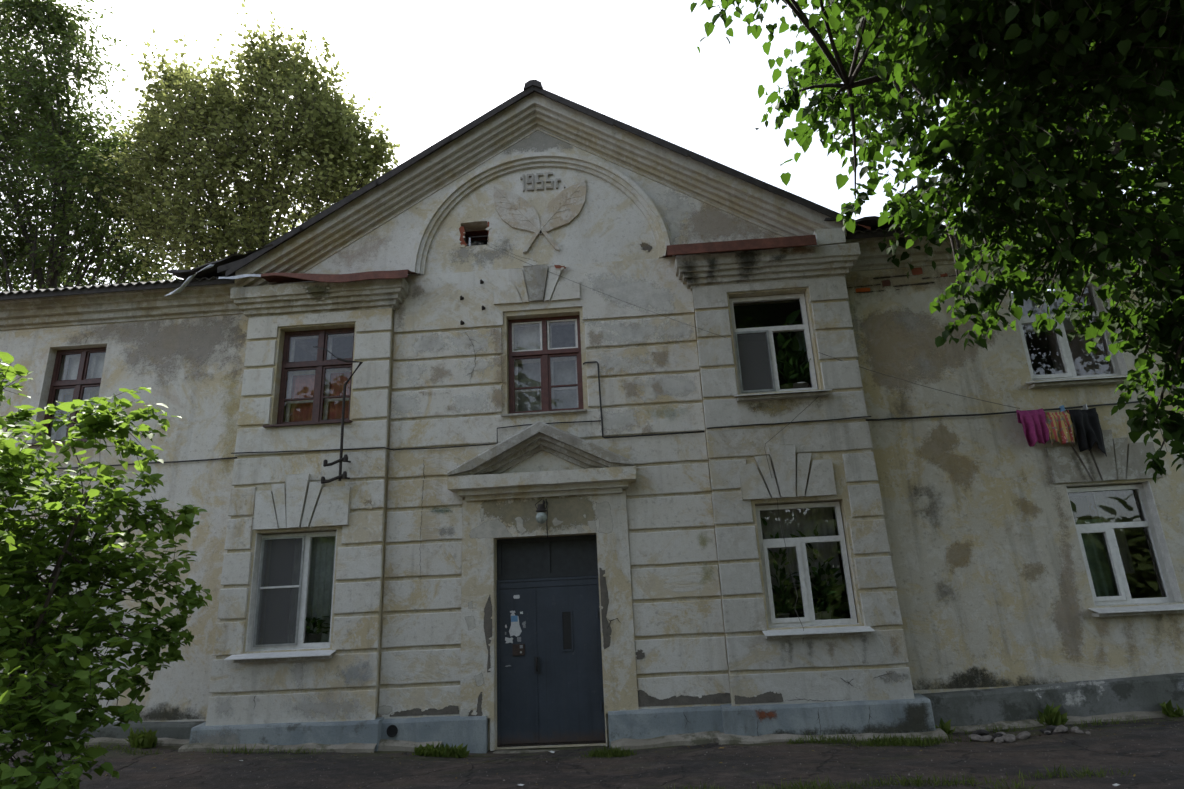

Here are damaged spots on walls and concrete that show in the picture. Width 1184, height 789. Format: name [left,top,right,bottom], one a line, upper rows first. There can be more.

flaking render [849,267,956,293]
flaking render [599,567,612,649]
flaking render [378,596,495,717]
flaking render [637,689,783,707]